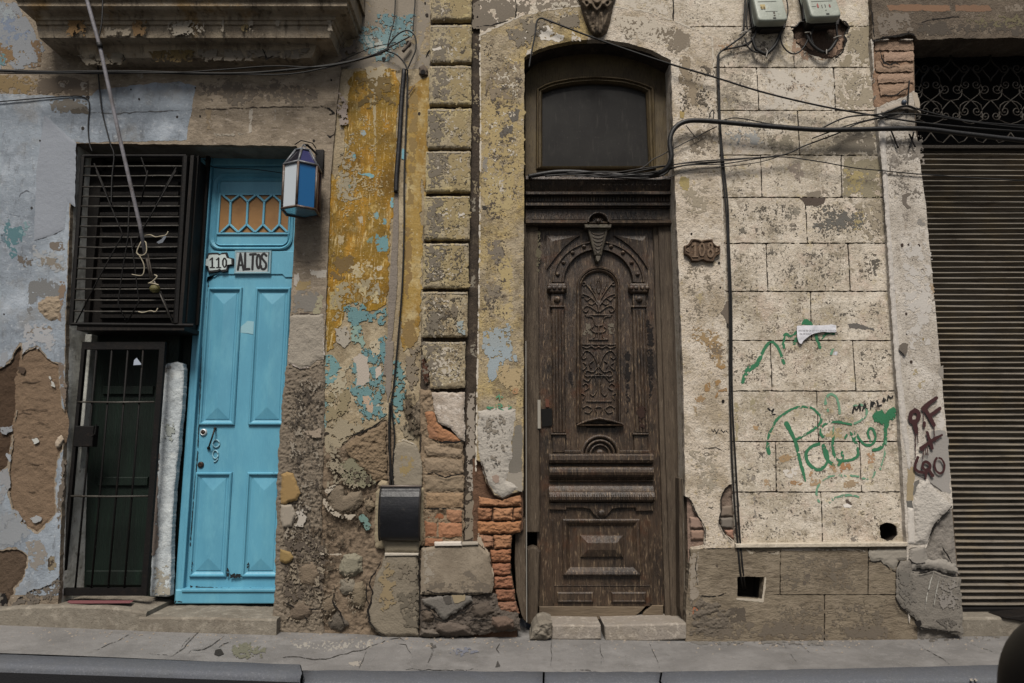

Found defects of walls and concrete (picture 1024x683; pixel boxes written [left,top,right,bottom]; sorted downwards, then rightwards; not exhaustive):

peeling [756,20,848,111]
flaking render [872,38,920,108]
flaking render [0,219,69,604]
flaking render [257,109,523,638]
flaking render [687,497,704,562]
flaking render [720,484,740,540]
flaking render [906,480,961,610]
flaking render [916,620,962,639]